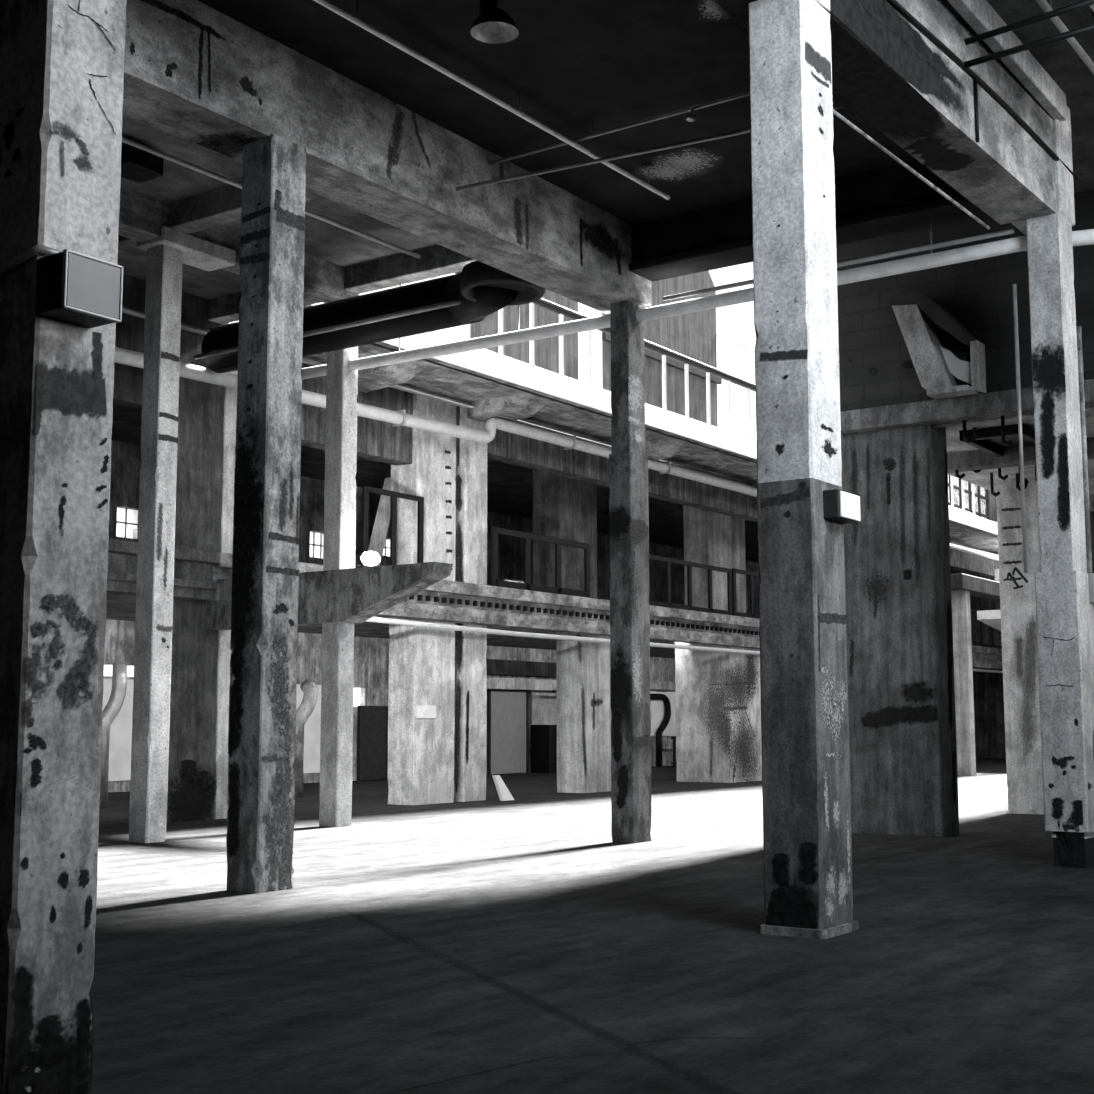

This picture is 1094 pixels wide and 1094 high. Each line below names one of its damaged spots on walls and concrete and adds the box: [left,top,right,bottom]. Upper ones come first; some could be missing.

damp [35,332,107,435]
damp [1032,345,1070,531]
damp [861,682,938,728]
damp [8,966,93,1094]